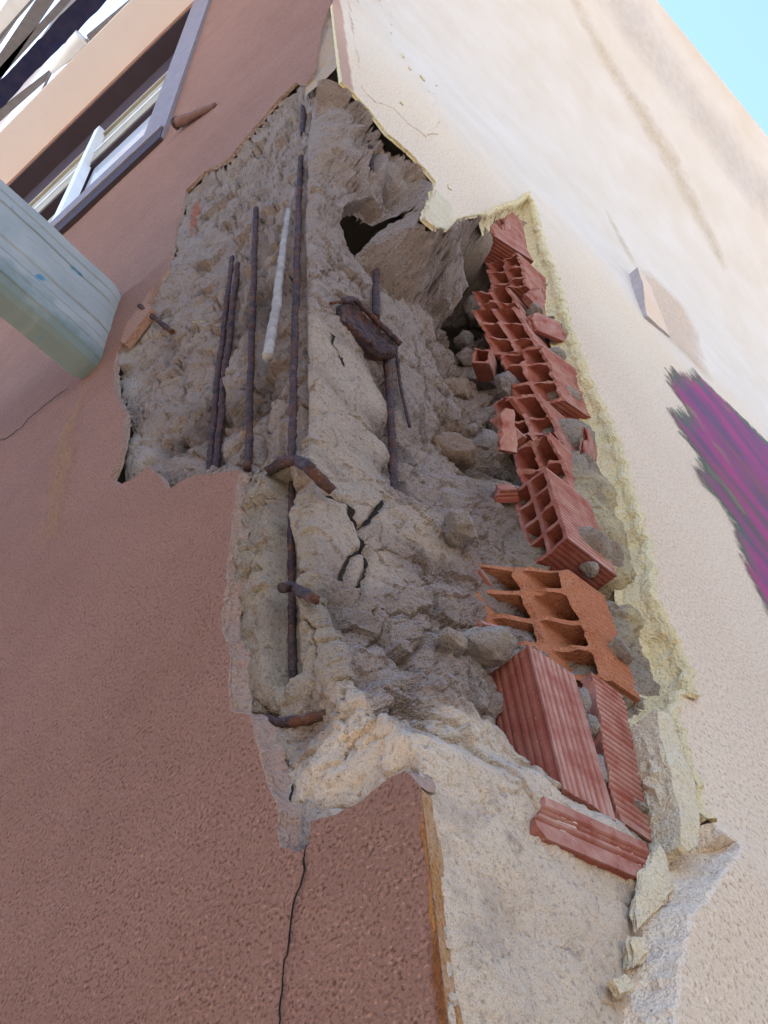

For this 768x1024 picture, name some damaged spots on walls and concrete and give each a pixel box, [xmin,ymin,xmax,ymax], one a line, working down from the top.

spalling [156,4,449,289]
crack [326,496,384,599]
spalling [110,77,744,1024]
crack [278,845,307,1024]